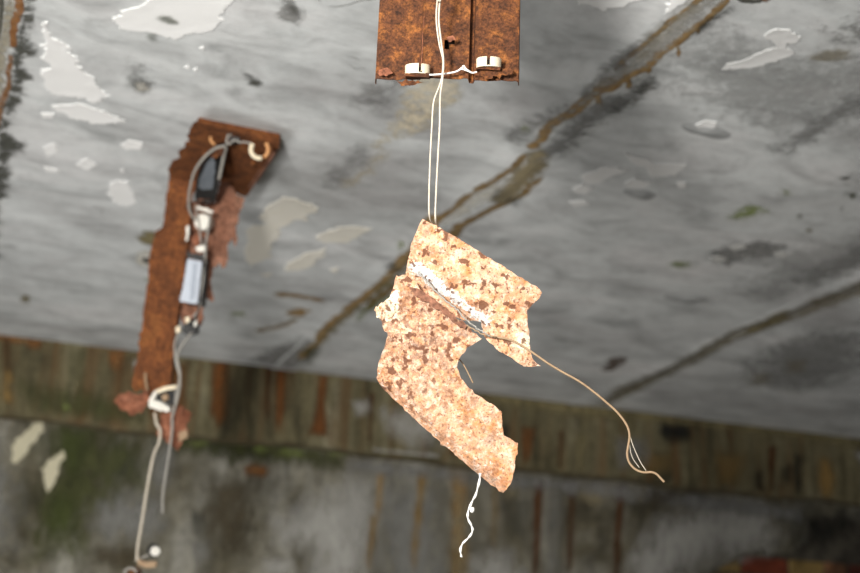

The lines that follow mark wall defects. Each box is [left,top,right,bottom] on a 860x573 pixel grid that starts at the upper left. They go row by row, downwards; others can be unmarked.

rust [0,0,24,121]
peeling [39,21,125,124]
peeling [112,0,234,40]
rust [425,0,730,237]
peeling [722,28,801,70]
rust [256,292,323,332]
rust [298,245,411,359]
peeling [11,422,44,464]
peeling [42,450,65,492]
water stain [98,500,160,567]
water stain [274,480,369,573]
water stain [510,478,793,573]